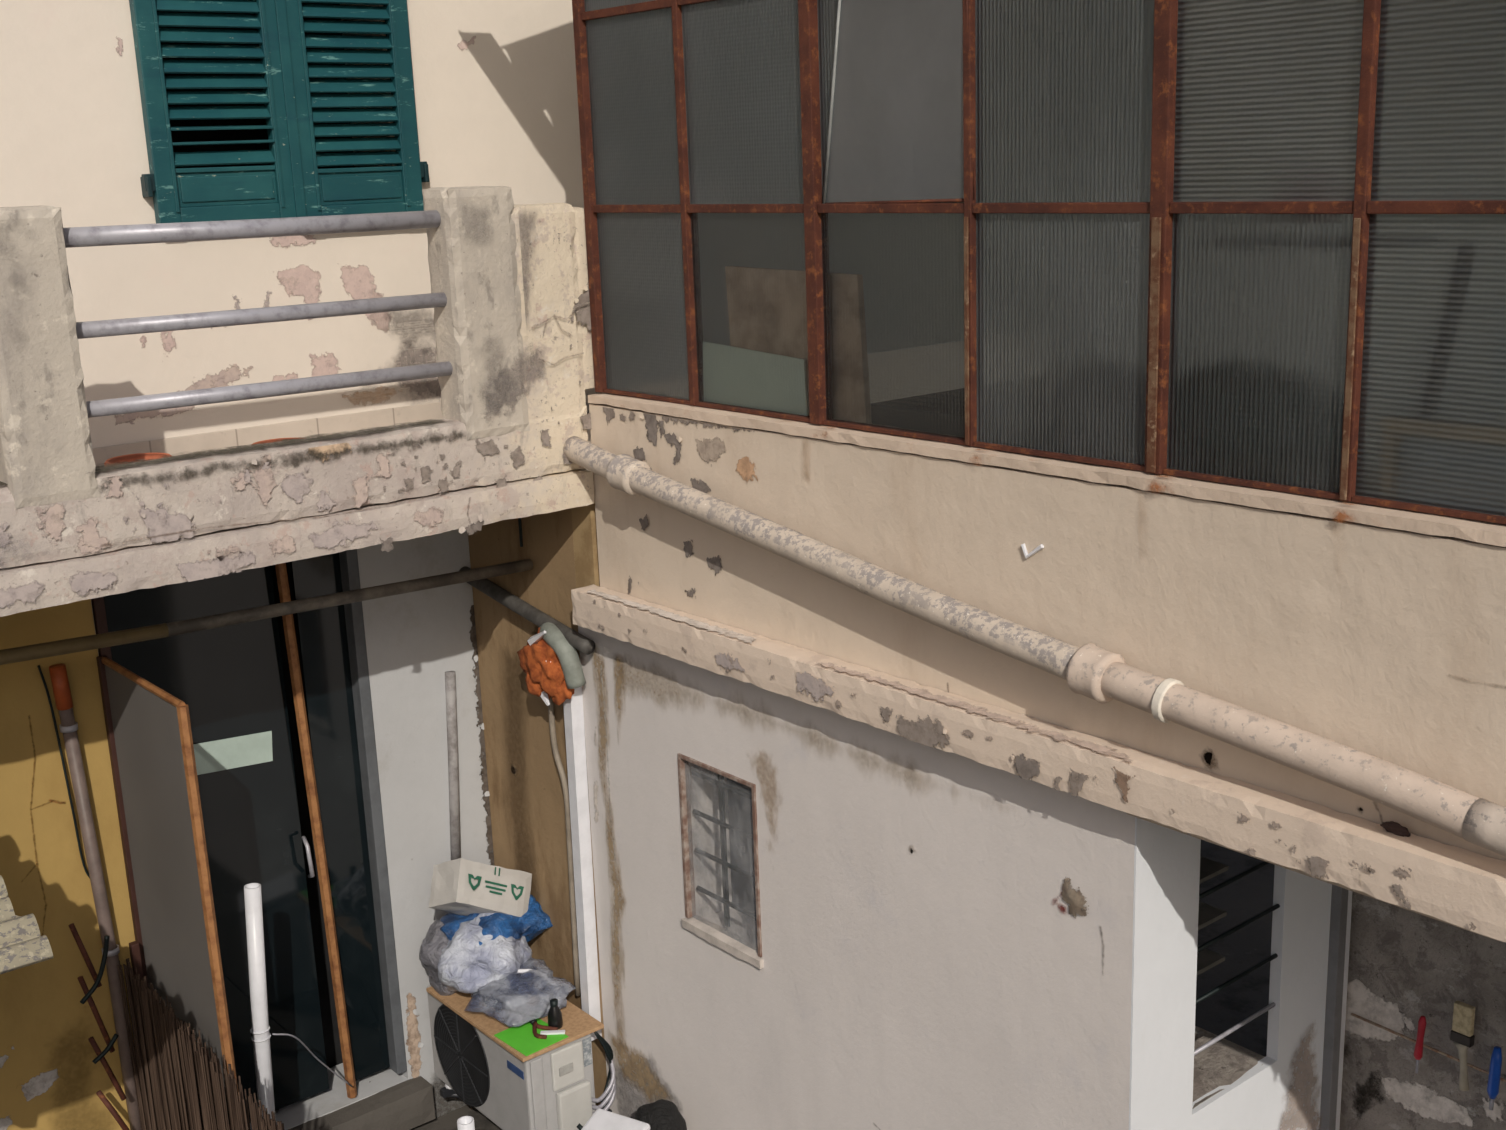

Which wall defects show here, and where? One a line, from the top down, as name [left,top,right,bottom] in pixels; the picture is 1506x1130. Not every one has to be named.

peeling [263,235,322,320]
peeling [337,263,392,332]
peeling [139,331,176,357]
peeling [114,364,253,426]
peeling [272,352,342,381]
peeling [342,385,402,406]
peeling [475,439,543,488]
peeling [540,407,573,465]
peeling [580,407,758,493]
peeling [103,435,462,582]
spalling [459,514,484,535]
peeling [796,662,1135,803]